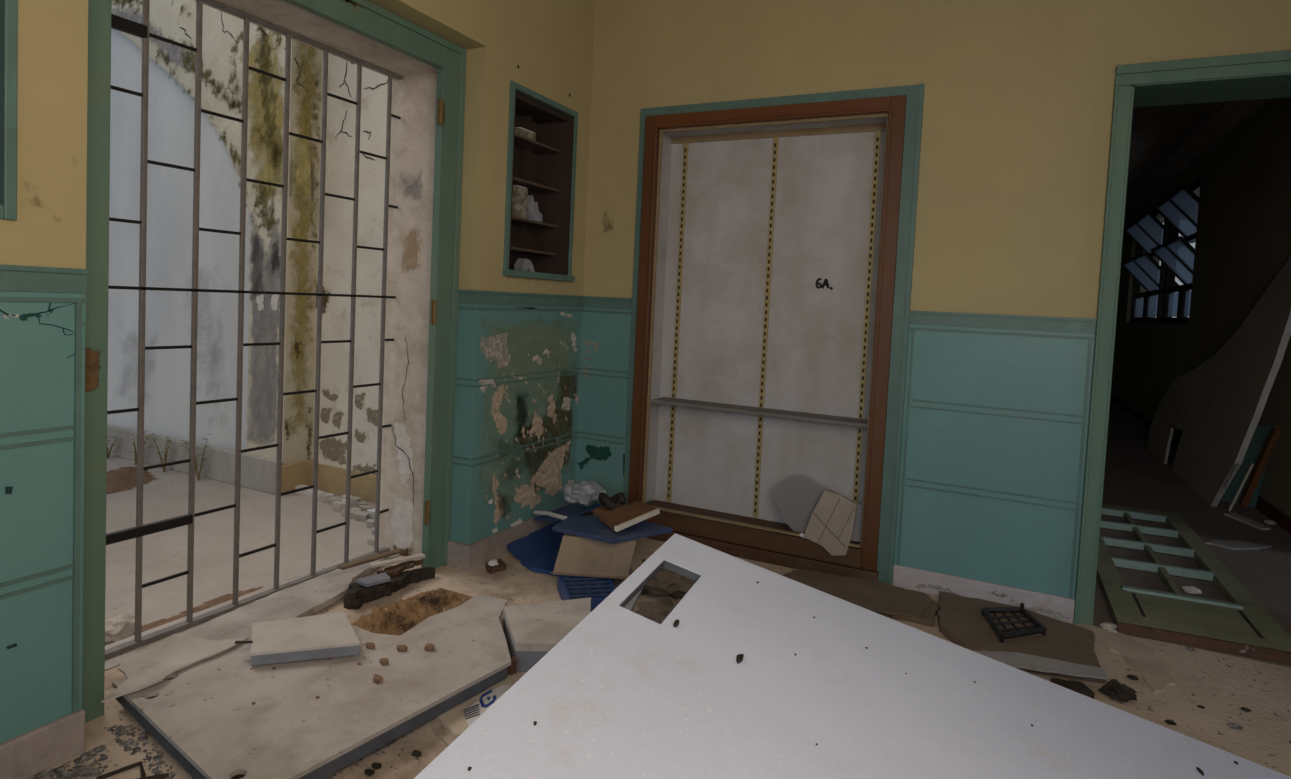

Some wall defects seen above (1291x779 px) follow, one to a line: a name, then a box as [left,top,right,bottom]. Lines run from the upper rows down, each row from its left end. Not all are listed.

crack [0,302,85,358]
water stain [114,0,320,460]
peeling [479,312,611,533]